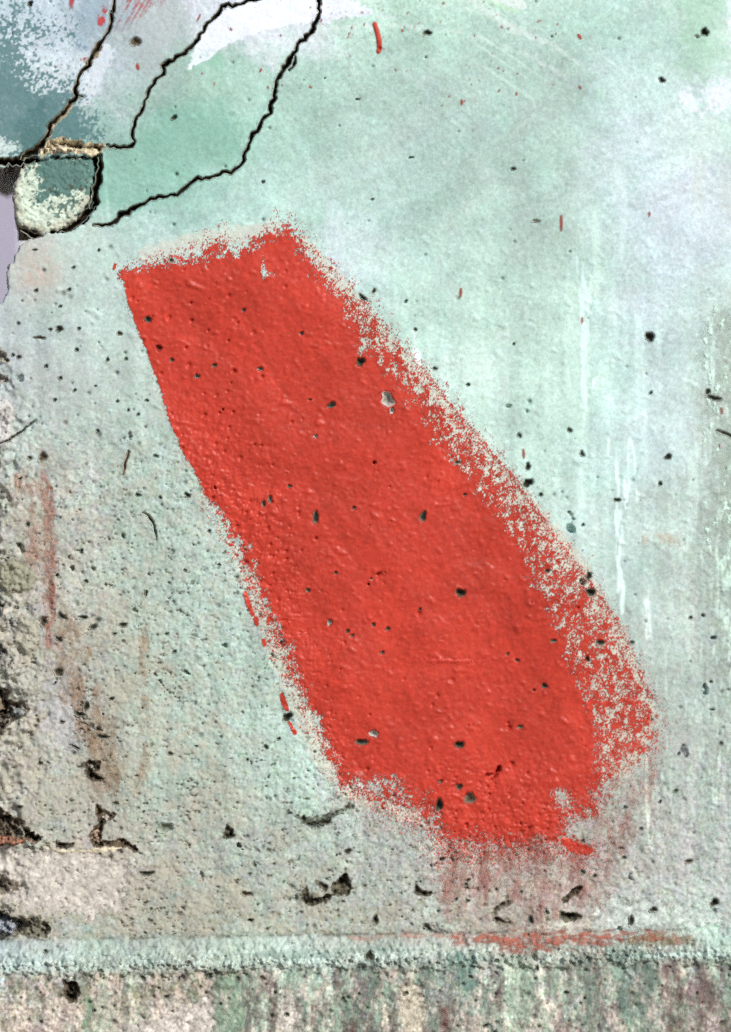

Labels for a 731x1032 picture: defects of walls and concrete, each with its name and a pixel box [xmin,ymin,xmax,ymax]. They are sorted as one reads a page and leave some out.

crack [0,0,116,167]
spalling [39,105,105,158]
crack [20,0,322,239]